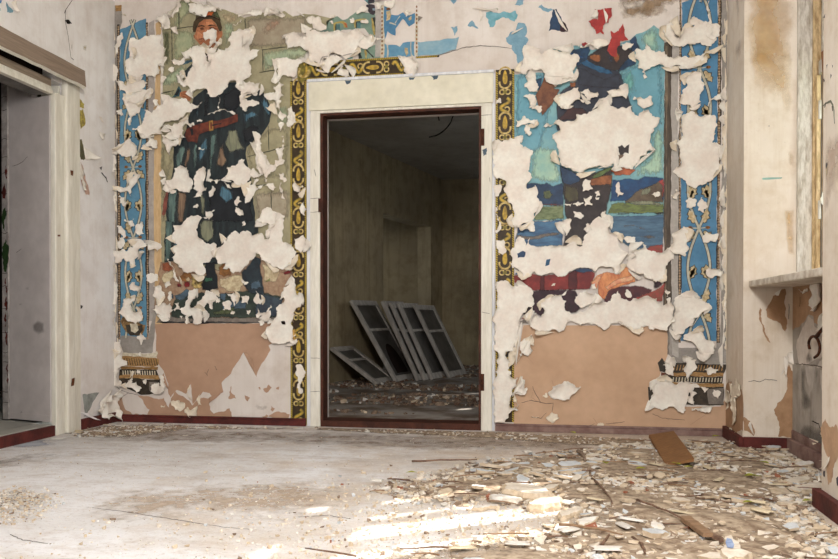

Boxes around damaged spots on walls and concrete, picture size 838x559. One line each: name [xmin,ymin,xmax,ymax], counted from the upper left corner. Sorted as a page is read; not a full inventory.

leakage [624,0,672,16]
peeling [398,55,419,80]
peeling [80,0,395,422]
peeling [438,0,822,438]
spalling [386,344,408,373]
peeling [809,420,838,486]